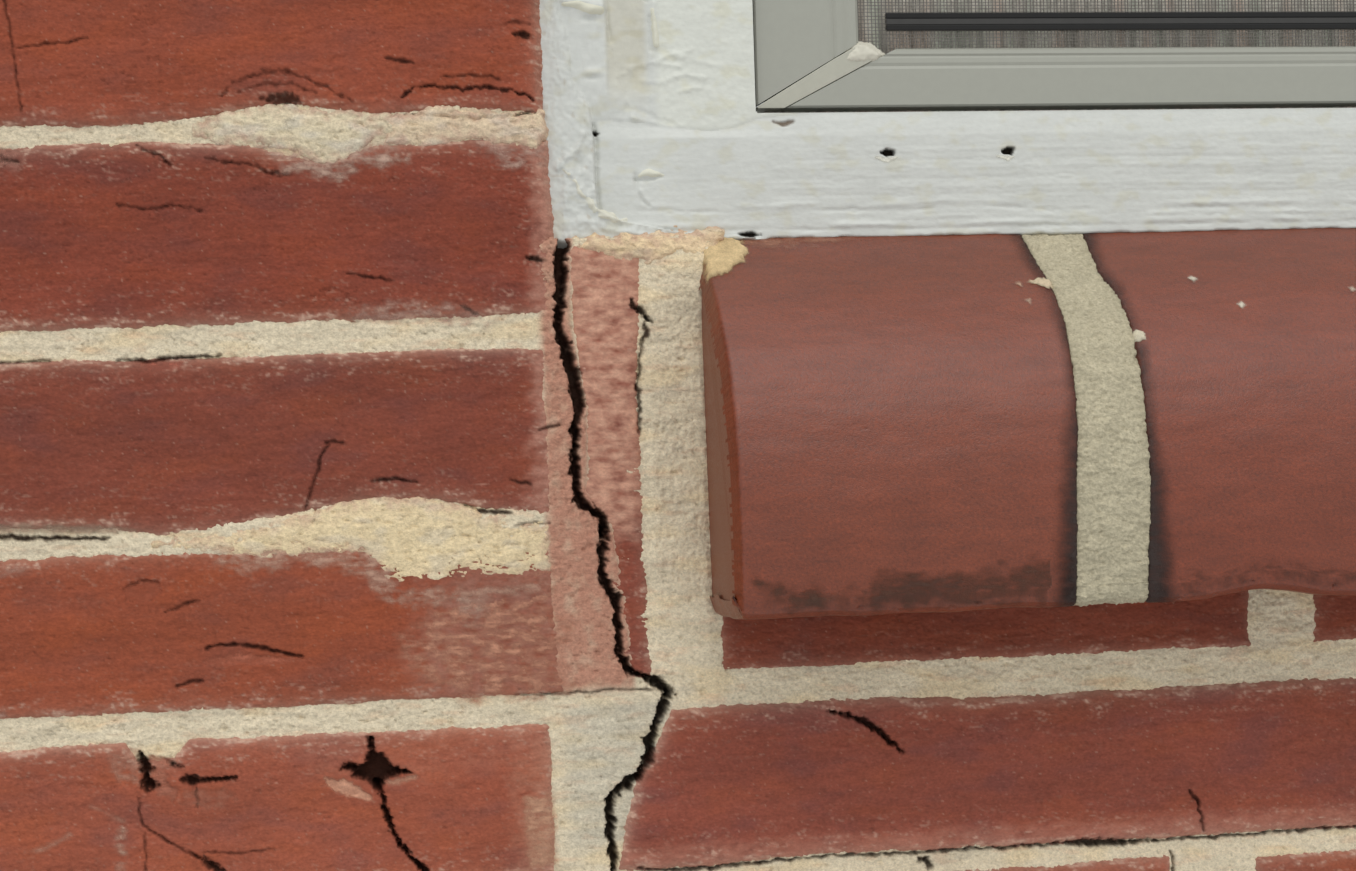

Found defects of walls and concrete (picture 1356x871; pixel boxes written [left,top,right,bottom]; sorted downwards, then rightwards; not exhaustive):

crack [542,243,669,871]
crack [207,643,299,662]
crack [830,711,900,750]
crack [142,822,225,871]